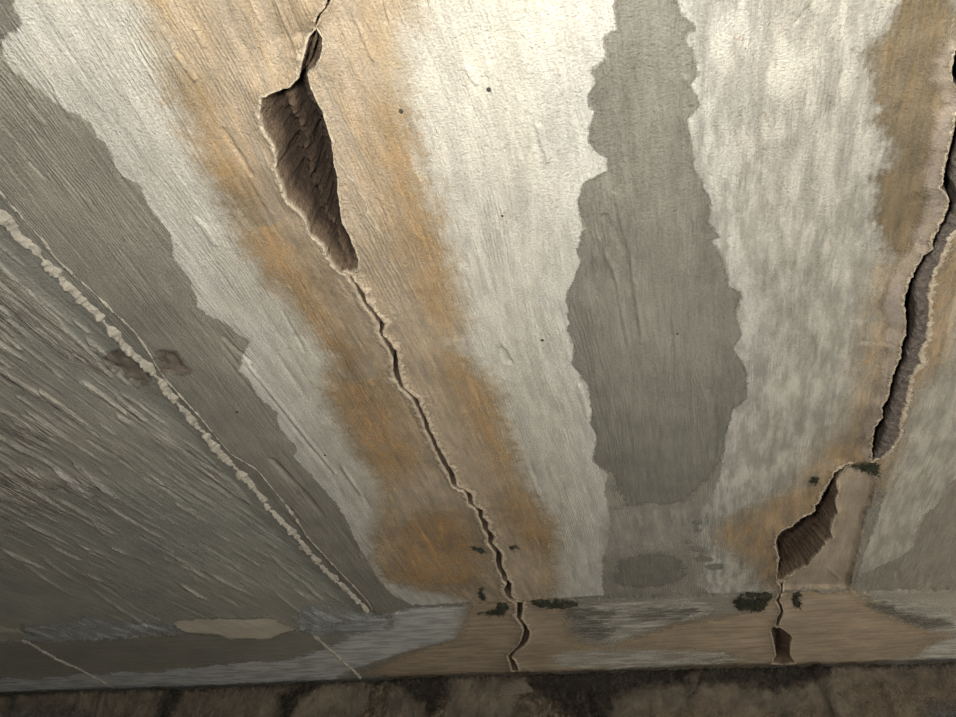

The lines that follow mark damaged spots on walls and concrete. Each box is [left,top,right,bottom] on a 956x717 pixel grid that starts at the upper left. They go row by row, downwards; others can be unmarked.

damp [0,0,470,692]
crack [254,0,533,672]
corrosion [150,0,952,678]
damp [375,0,956,670]
crack [768,110,956,665]
crack [948,49,956,87]